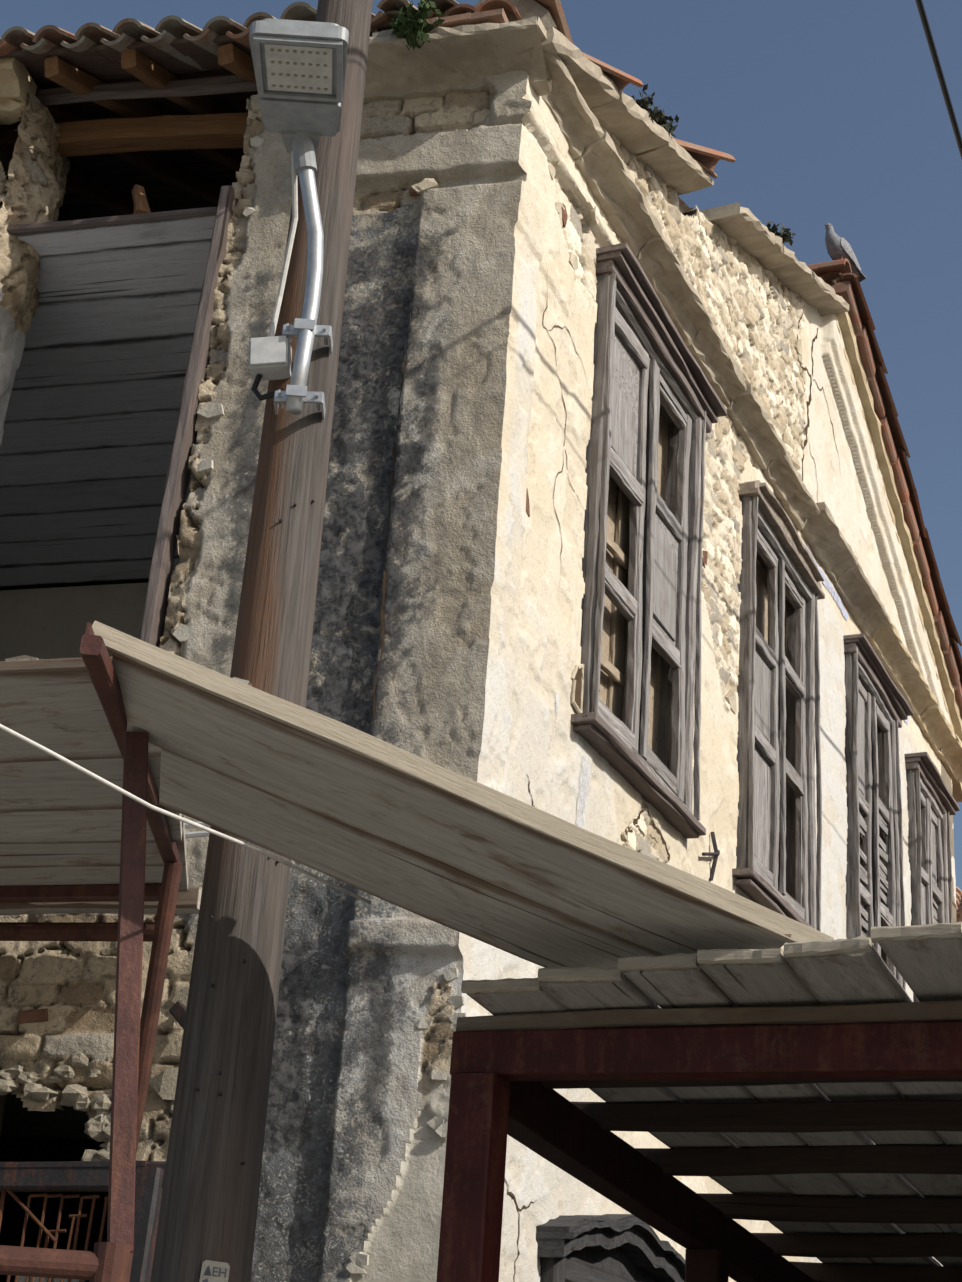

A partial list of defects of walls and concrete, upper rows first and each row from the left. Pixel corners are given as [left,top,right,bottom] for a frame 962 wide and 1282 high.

leakage [306,224,459,748]
crack [543,271,587,576]
crack [797,306,840,500]
flaking render [0,913,118,922]
flaking render [621,805,671,865]
flaking render [0,941,117,1161]
flaking render [136,916,191,1161]
leakage [265,926,329,1161]
leakage [341,968,410,1151]
peeling [346,967,467,1282]
crack [505,1179,534,1282]